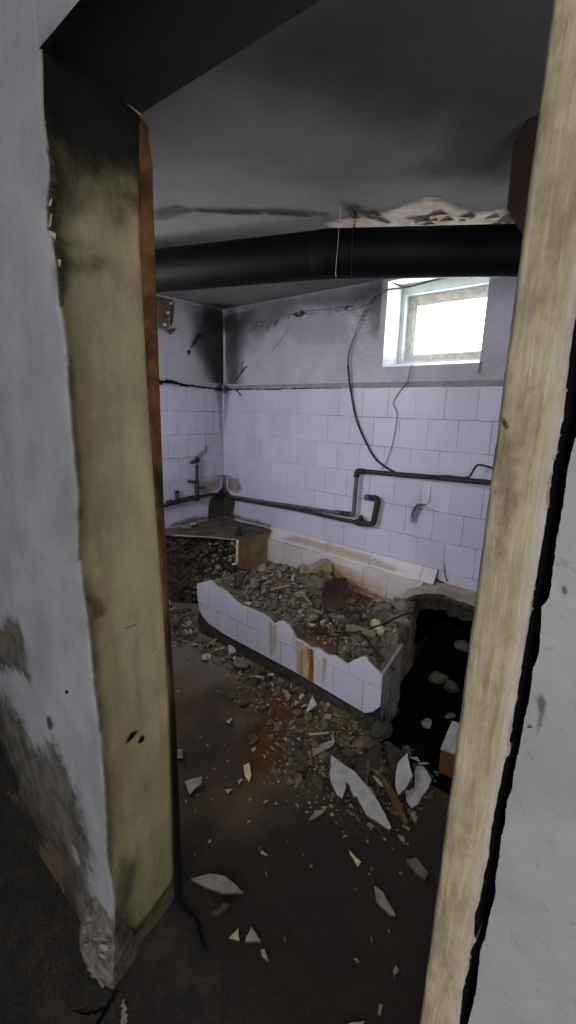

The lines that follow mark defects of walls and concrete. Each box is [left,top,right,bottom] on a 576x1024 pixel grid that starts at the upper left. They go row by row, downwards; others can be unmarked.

peeling [326,198,514,228]
crack [159,360,343,396]
corrosion [297,567,379,682]